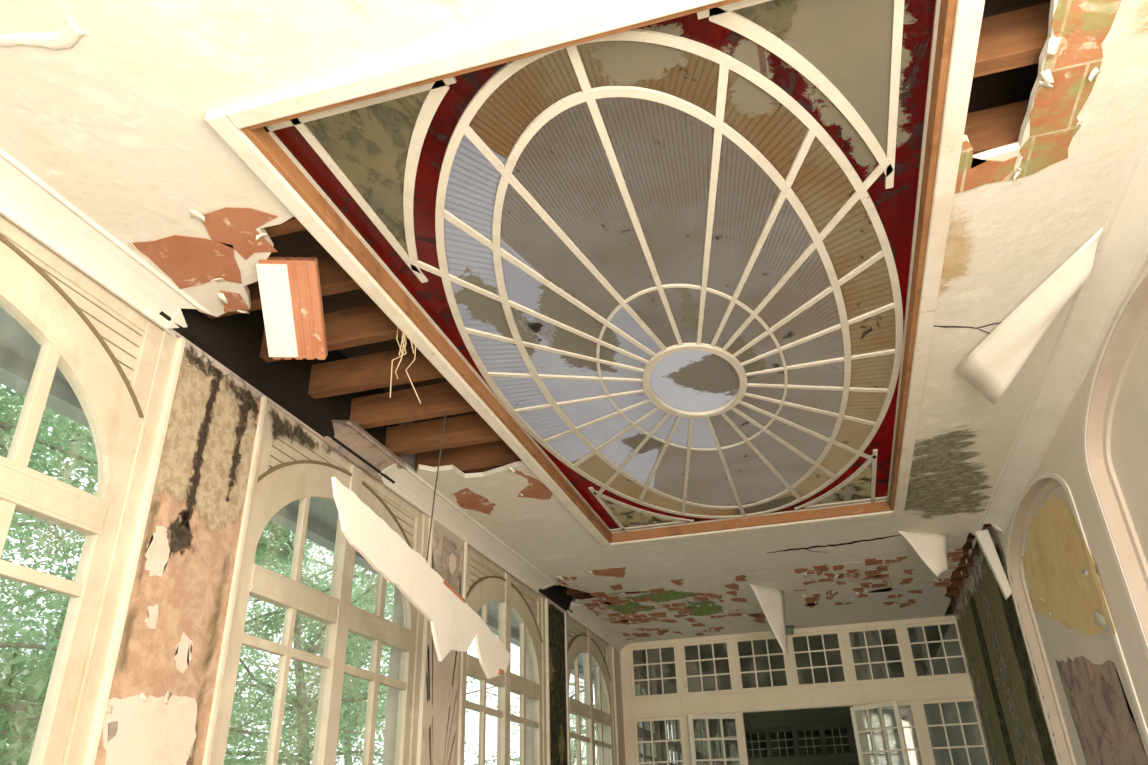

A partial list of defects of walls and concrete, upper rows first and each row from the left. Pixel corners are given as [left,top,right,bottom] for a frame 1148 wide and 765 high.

flaking render [955,0,1121,193]
flaking render [174,353,206,395]
flaking render [128,207,278,314]
peeling [954,227,1103,405]
water stain [905,429,990,518]
flaking render [95,488,247,765]
flaking render [554,531,963,655]